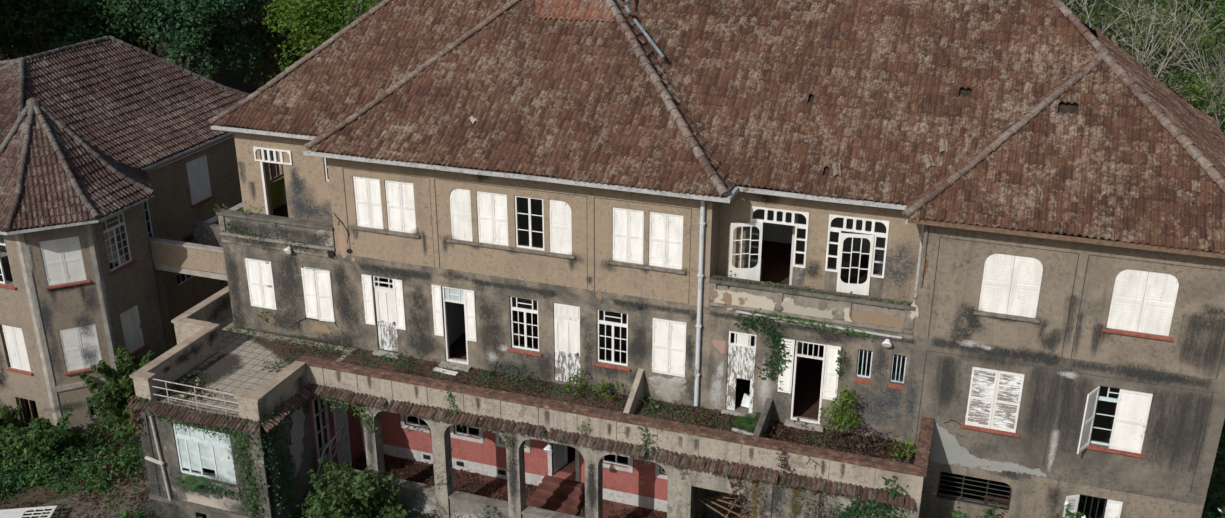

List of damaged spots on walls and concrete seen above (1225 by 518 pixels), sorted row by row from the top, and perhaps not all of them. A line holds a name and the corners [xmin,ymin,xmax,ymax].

leakage [224,168,362,349]
leakage [25,245,112,366]
leakage [163,330,218,372]
leakage [360,264,439,353]
leakage [445,270,554,381]
flaking render [711,288,919,329]
leakage [933,297,1225,470]
flaking render [929,421,1046,478]
flaking render [183,490,258,518]
leakage [771,474,786,516]